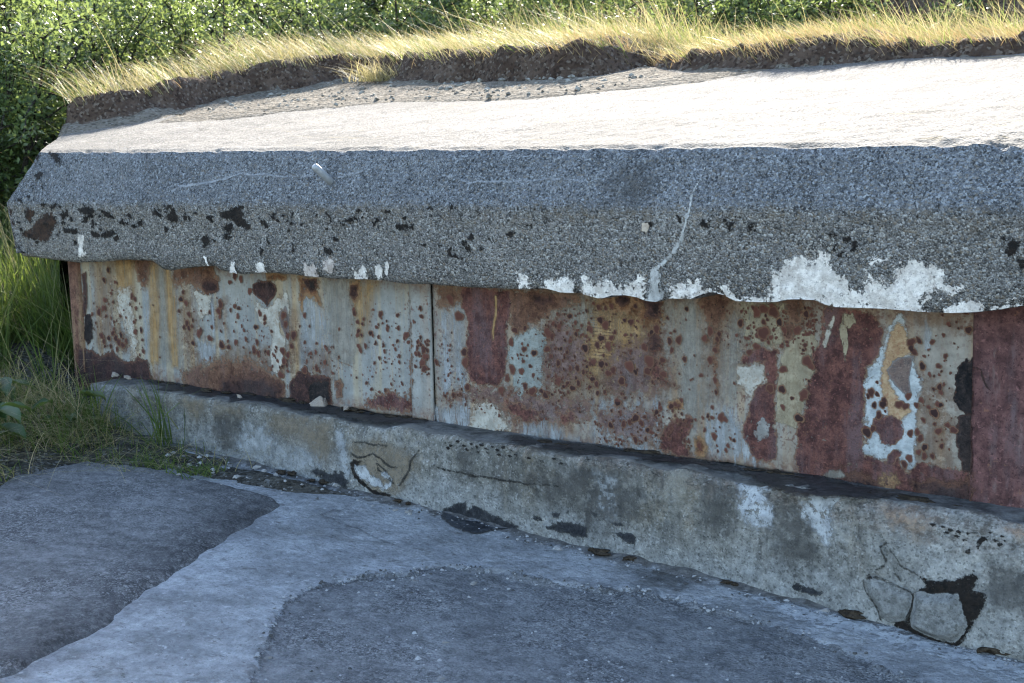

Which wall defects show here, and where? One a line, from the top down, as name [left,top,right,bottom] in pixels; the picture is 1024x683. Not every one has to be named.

water stain [515,271,647,300]
water stain [667,250,1022,313]
rust [75,260,344,404]
rust [338,279,976,501]
peeling [862,312,924,472]
crack [863,542,916,622]
spalling [866,566,1024,646]